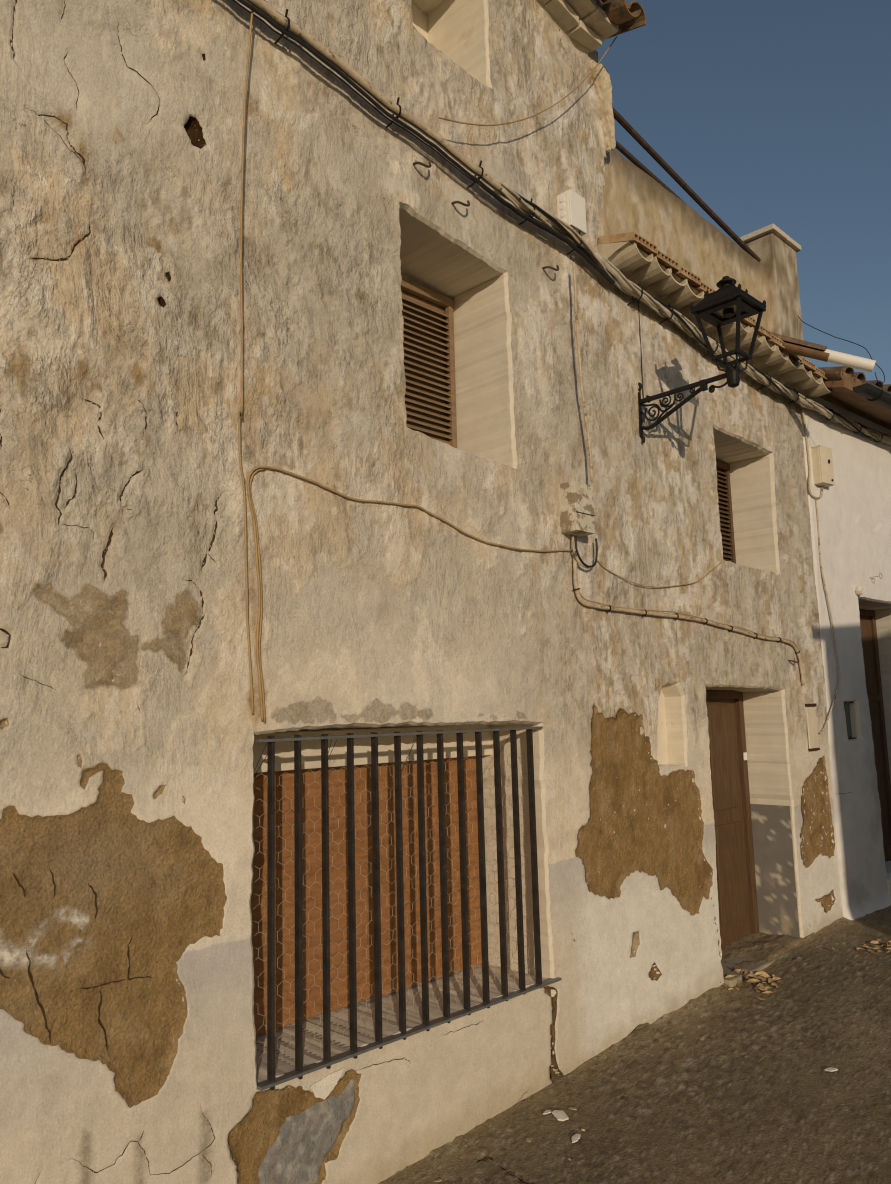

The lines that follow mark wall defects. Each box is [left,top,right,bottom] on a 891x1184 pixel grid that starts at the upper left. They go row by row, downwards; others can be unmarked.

crack [9,0,17,63]
crack [27,54,85,168]
crack [30,221,93,261]
crack [84,399,104,440]
crack [55,451,143,580]
crack [185,497,219,674]
flaking render [575,704,713,916]
flaking render [800,756,835,868]
flaking render [0,754,227,1108]
crack [76,1110,215,1175]
flaking render [228,1067,361,1184]